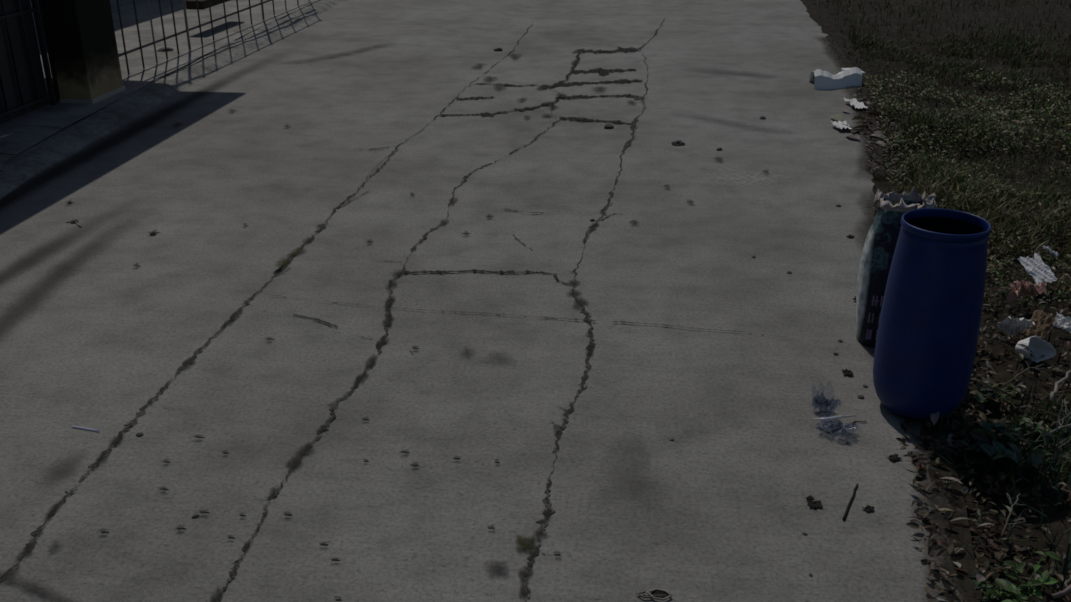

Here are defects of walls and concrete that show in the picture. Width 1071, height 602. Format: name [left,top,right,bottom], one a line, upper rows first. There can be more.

crack [0,19,782,602]